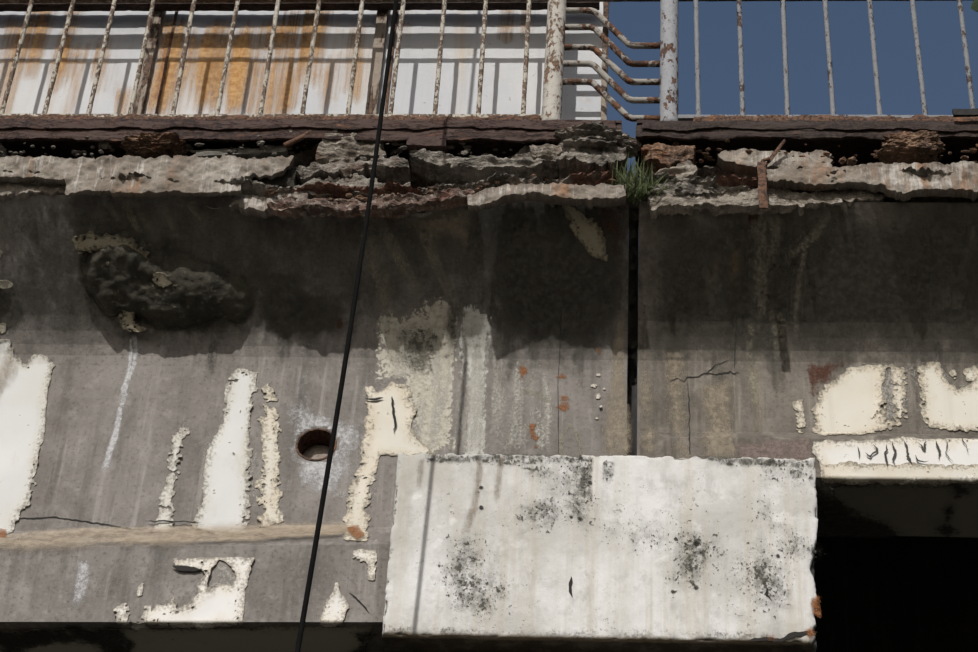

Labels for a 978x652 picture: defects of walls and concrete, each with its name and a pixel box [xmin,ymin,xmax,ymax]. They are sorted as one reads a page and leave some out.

spalling [72,121,978,229]
peeling [562,205,608,262]
peeling [0,323,56,535]
leakage [103,337,138,467]
peeling [191,368,284,533]
peeling [343,297,492,581]
leakage [160,201,895,621]
crack [668,308,739,453]
peeling [792,361,978,538]
crack [858,438,968,467]
leakage [0,525,353,547]
peeling [0,557,374,652]